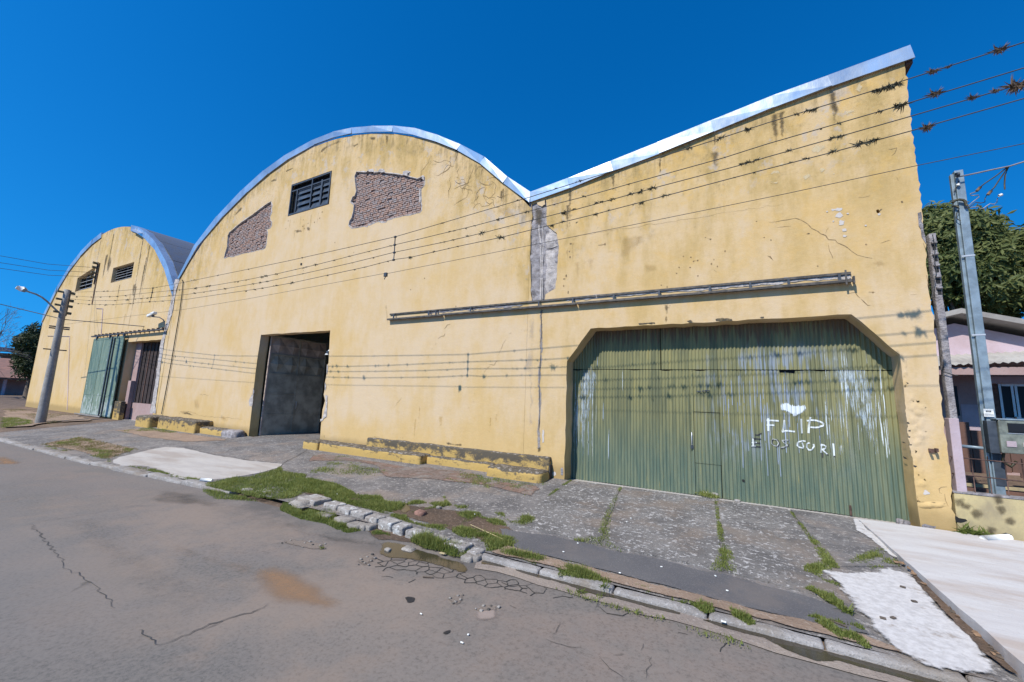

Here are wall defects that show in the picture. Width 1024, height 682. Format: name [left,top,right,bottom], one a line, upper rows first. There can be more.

flaking render [348,169,425,229]
flaking render [224,201,273,258]
spalling [426,200,851,314]